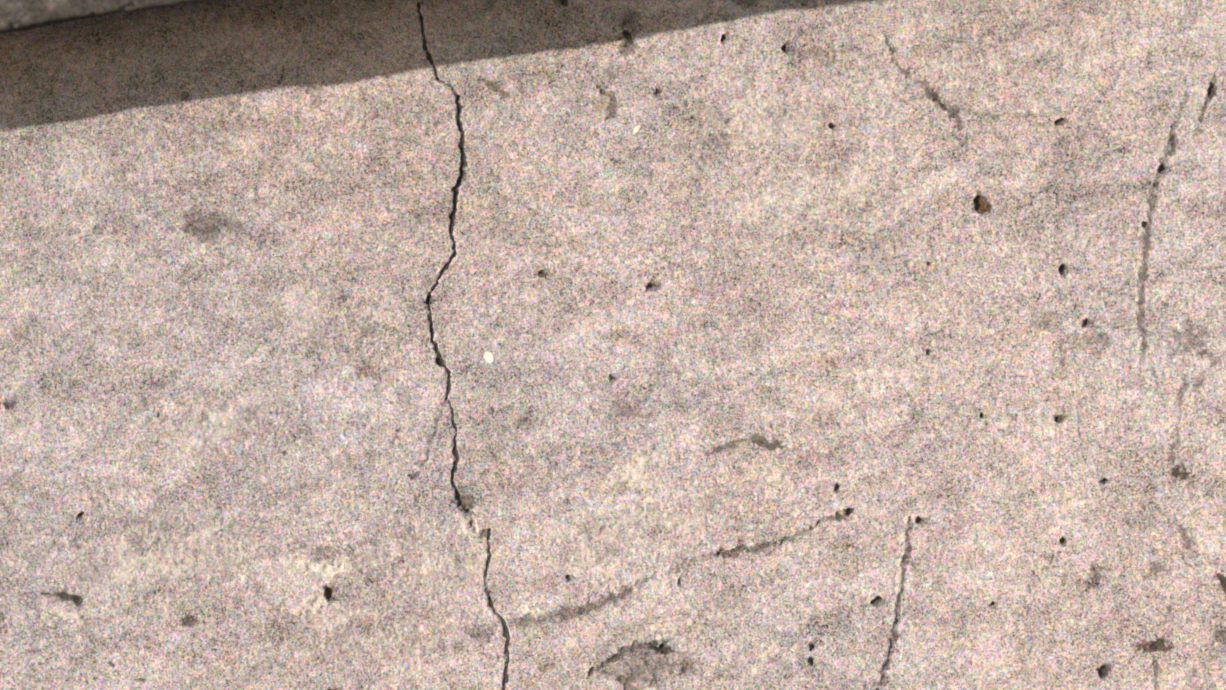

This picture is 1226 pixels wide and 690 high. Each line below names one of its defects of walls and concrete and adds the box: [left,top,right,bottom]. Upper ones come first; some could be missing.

crack [417,2,510,690]